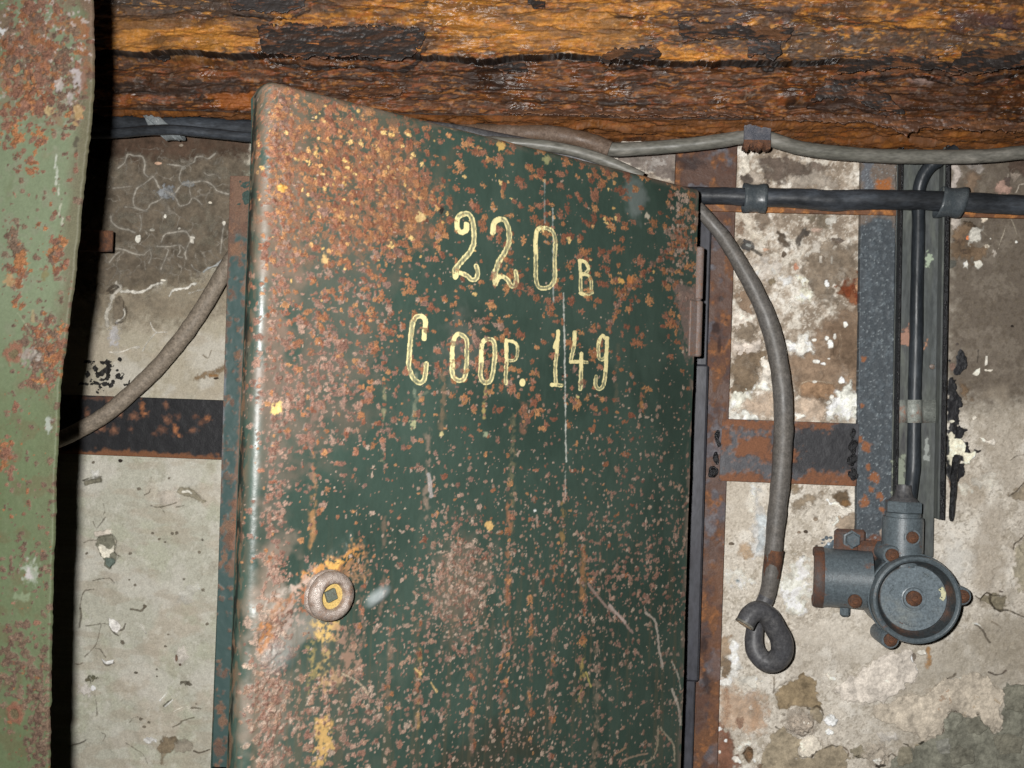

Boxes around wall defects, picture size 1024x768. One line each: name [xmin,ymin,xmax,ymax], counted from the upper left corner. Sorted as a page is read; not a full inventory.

peeling [959,472,998,496]
peeling [736,647,1024,768]